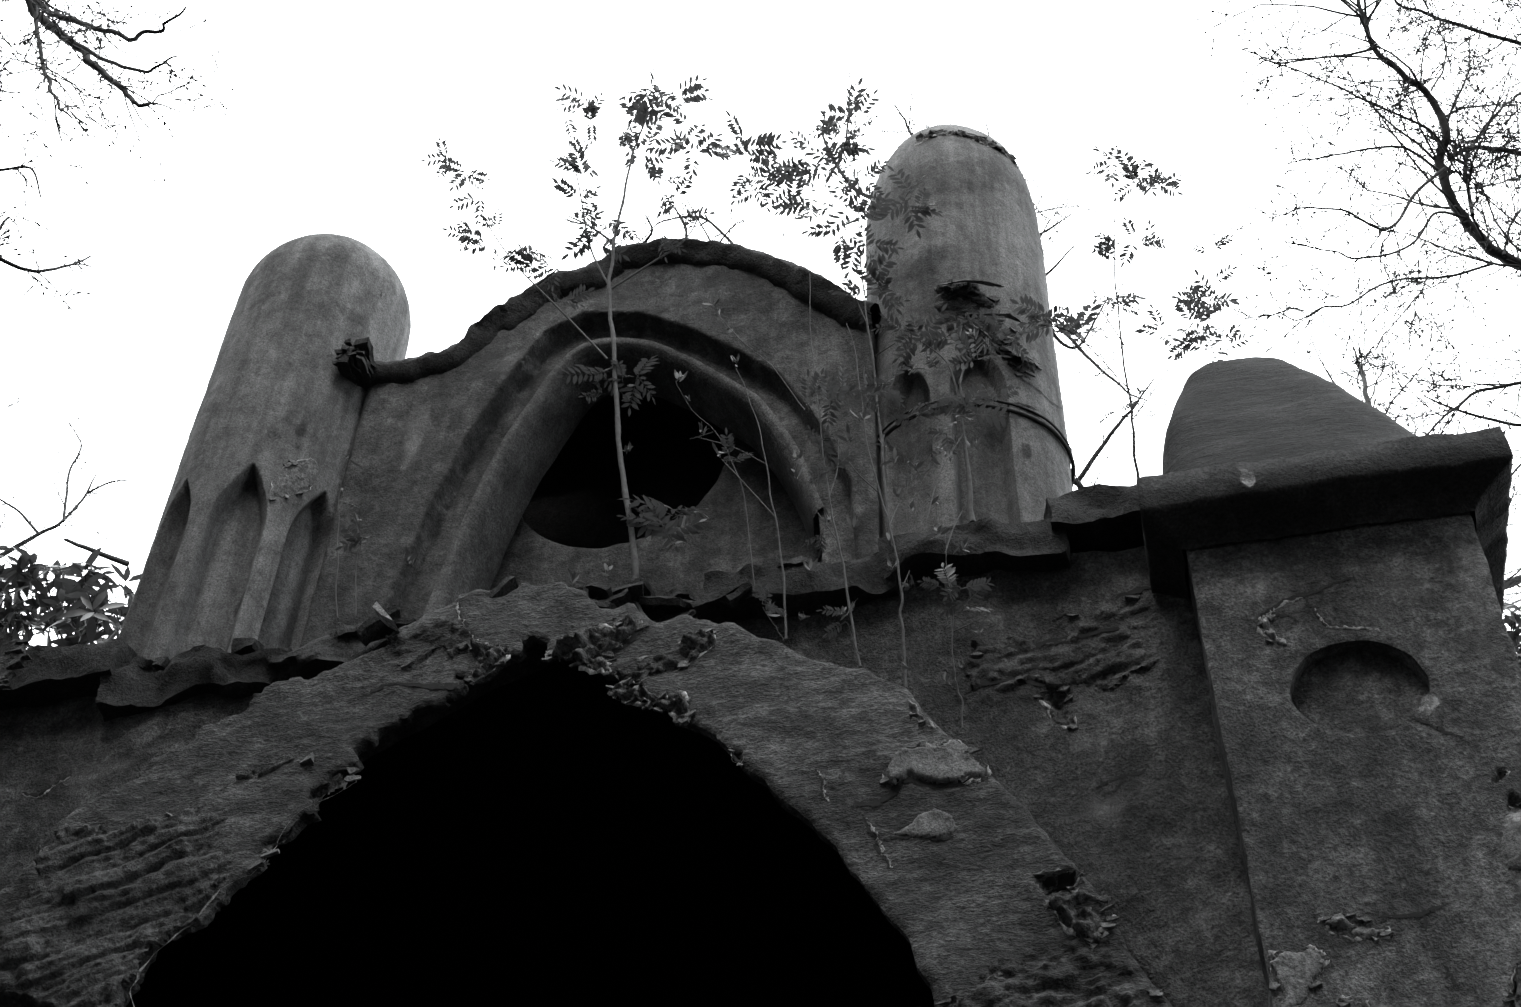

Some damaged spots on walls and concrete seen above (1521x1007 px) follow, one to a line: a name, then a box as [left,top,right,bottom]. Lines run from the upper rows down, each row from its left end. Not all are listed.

crack [1260,577,1380,632]
spalling [540,613,717,726]
flaking render [879,700,992,786]
flaking render [893,808,958,838]
flaking render [1268,913,1394,1007]
flaking render [1502,962,1521,1007]